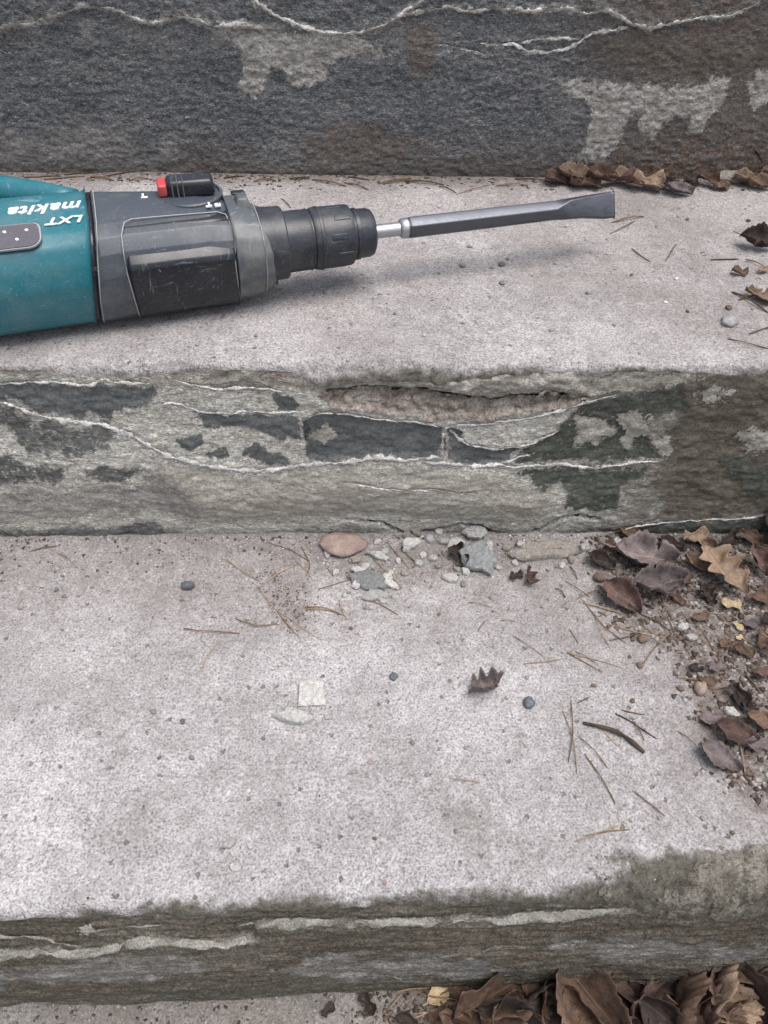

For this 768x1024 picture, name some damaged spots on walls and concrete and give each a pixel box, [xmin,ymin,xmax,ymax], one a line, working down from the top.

peeling [176,371,736,511]
peeling [718,425,768,496]
leakage [0,956,206,991]
leakage [290,952,499,983]
leakage [595,939,767,962]